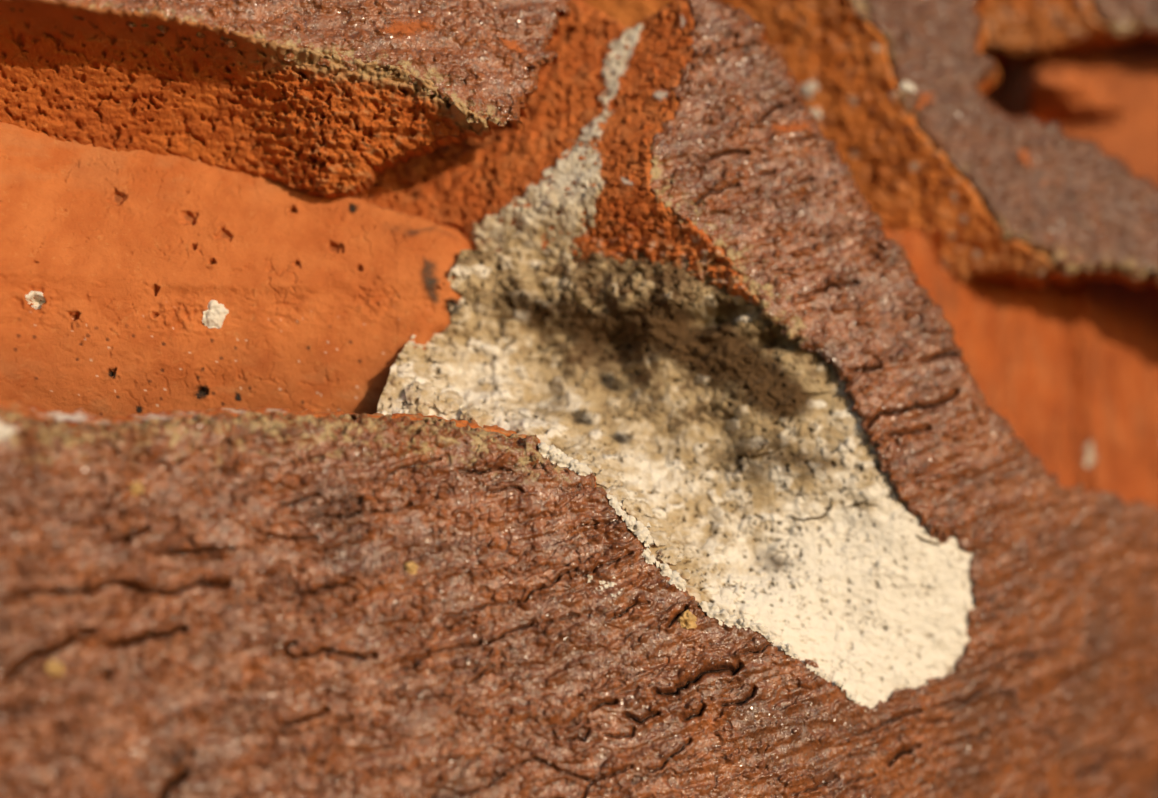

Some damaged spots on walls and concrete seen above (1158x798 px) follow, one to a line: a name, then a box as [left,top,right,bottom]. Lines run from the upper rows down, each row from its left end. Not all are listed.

spalling [717,0,1158,289]
spalling [0,122,472,418]
spalling [0,421,17,441]
spalling [0,398,69,425]
spalling [61,407,344,428]
spalling [356,0,976,708]
crack [737,442,781,458]
spalling [883,229,1158,507]
crack [283,711,349,726]
crack [284,643,376,660]
crack [413,554,629,698]
crack [452,645,773,798]